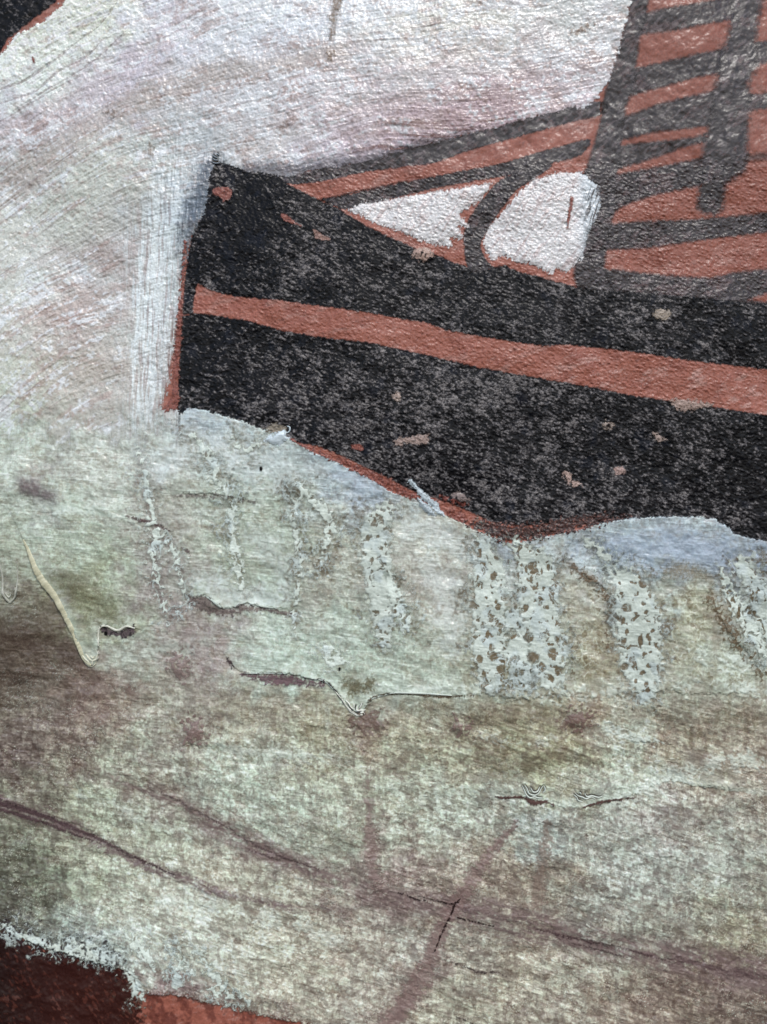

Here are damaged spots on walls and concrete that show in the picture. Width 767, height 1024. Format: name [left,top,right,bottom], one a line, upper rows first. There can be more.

peeling [135,421,676,712]
crack [495,796,554,807]
crack [583,797,634,808]
peeling [0,915,251,1011]
crack [398,892,507,977]